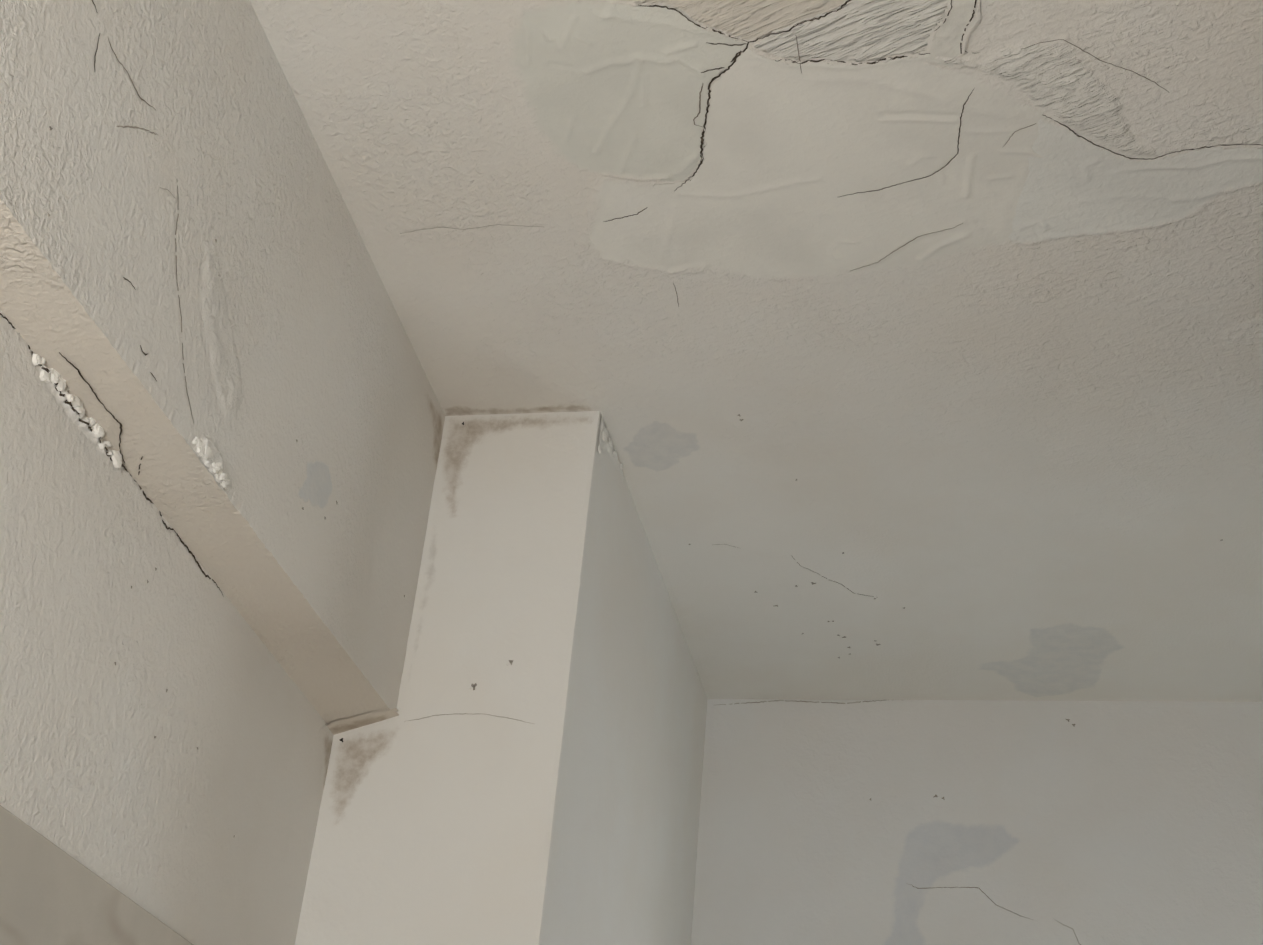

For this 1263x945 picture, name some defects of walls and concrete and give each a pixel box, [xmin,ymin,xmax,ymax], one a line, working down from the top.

crack [92,0,154,108]
crack [640,0,977,197]
crack [1023,39,1167,91]
crack [160,186,194,423]
flaking render [32,352,122,469]
flaking render [191,432,230,493]
damp [319,381,599,839]
damp [969,619,1132,700]
damp [834,812,1031,945]
crack [910,884,1081,945]